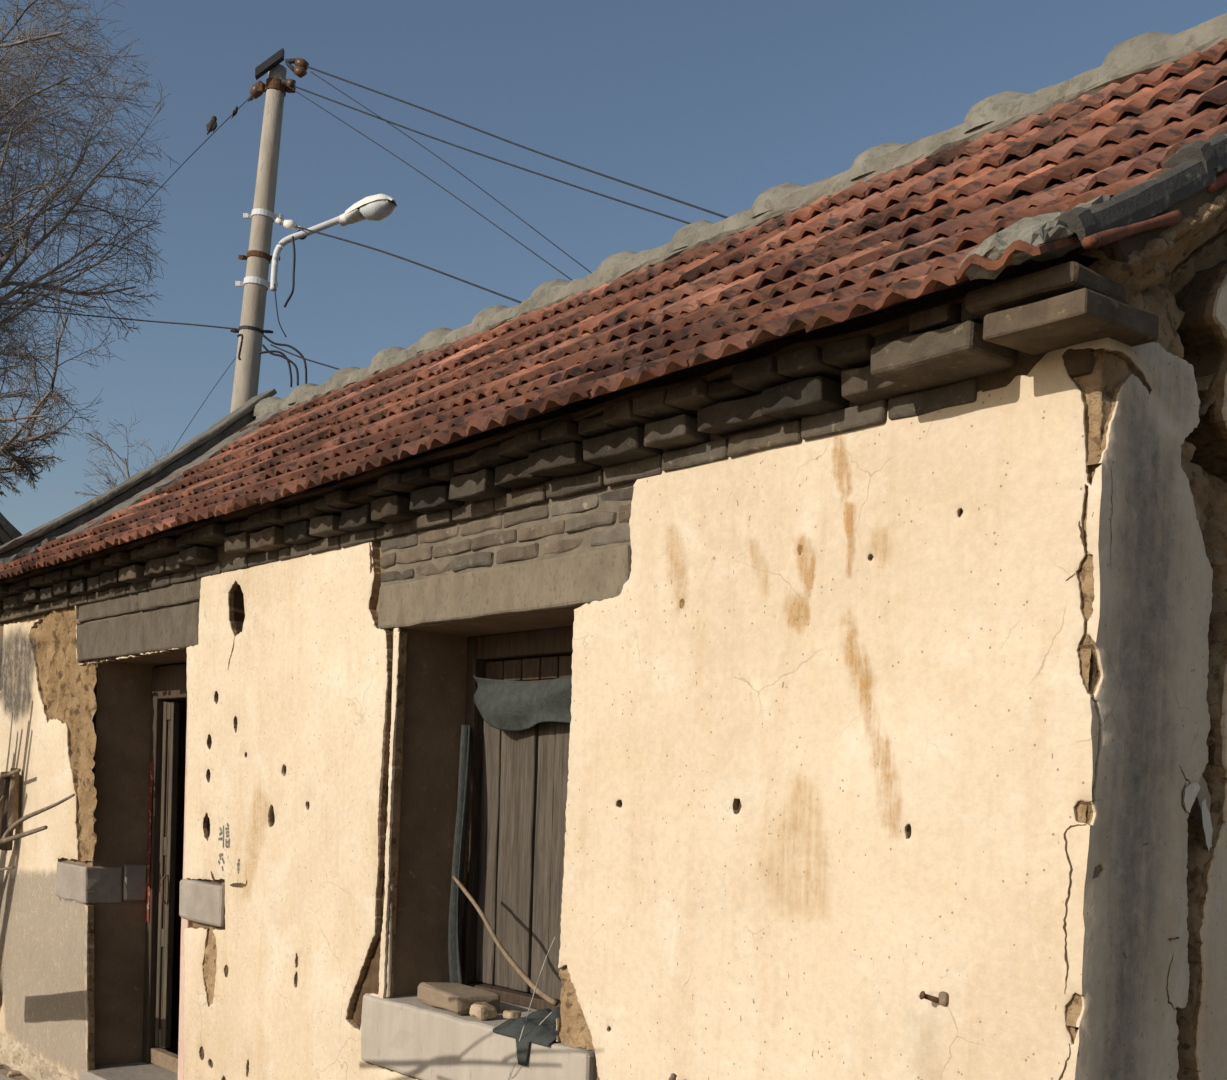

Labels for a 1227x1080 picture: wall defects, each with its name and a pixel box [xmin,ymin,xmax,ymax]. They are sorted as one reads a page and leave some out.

spalling [1125,228,1227,416]
crack [1066,467,1113,581]
spalling [28,607,98,862]
crack [1167,374,1227,1080]
crack [1063,824,1086,992]
peeling [0,1032,79,1080]
crack [1058,1043,1070,1080]